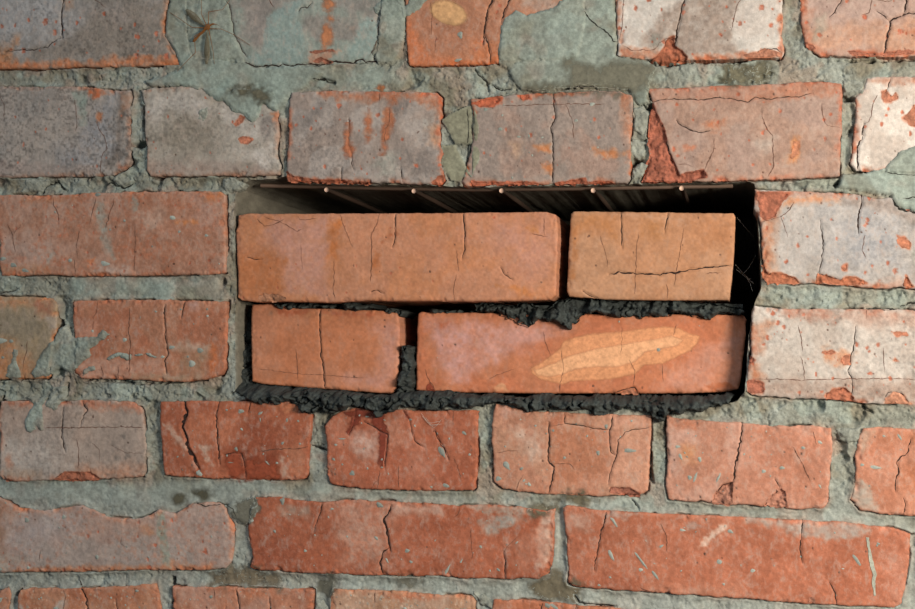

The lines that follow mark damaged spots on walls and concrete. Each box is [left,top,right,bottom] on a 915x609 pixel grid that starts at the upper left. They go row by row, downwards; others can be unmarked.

spalling [651,35,687,67]
spalling [744,48,783,62]
crack [862,0,915,53]
spalling [643,106,707,184]
crack [654,93,840,176]
spalling [882,89,898,102]
spalling [904,105,915,126]
crack [600,214,729,296]
spalling [816,265,865,287]
crack [182,401,327,473]
crack [547,416,649,507]
crack [718,423,743,492]